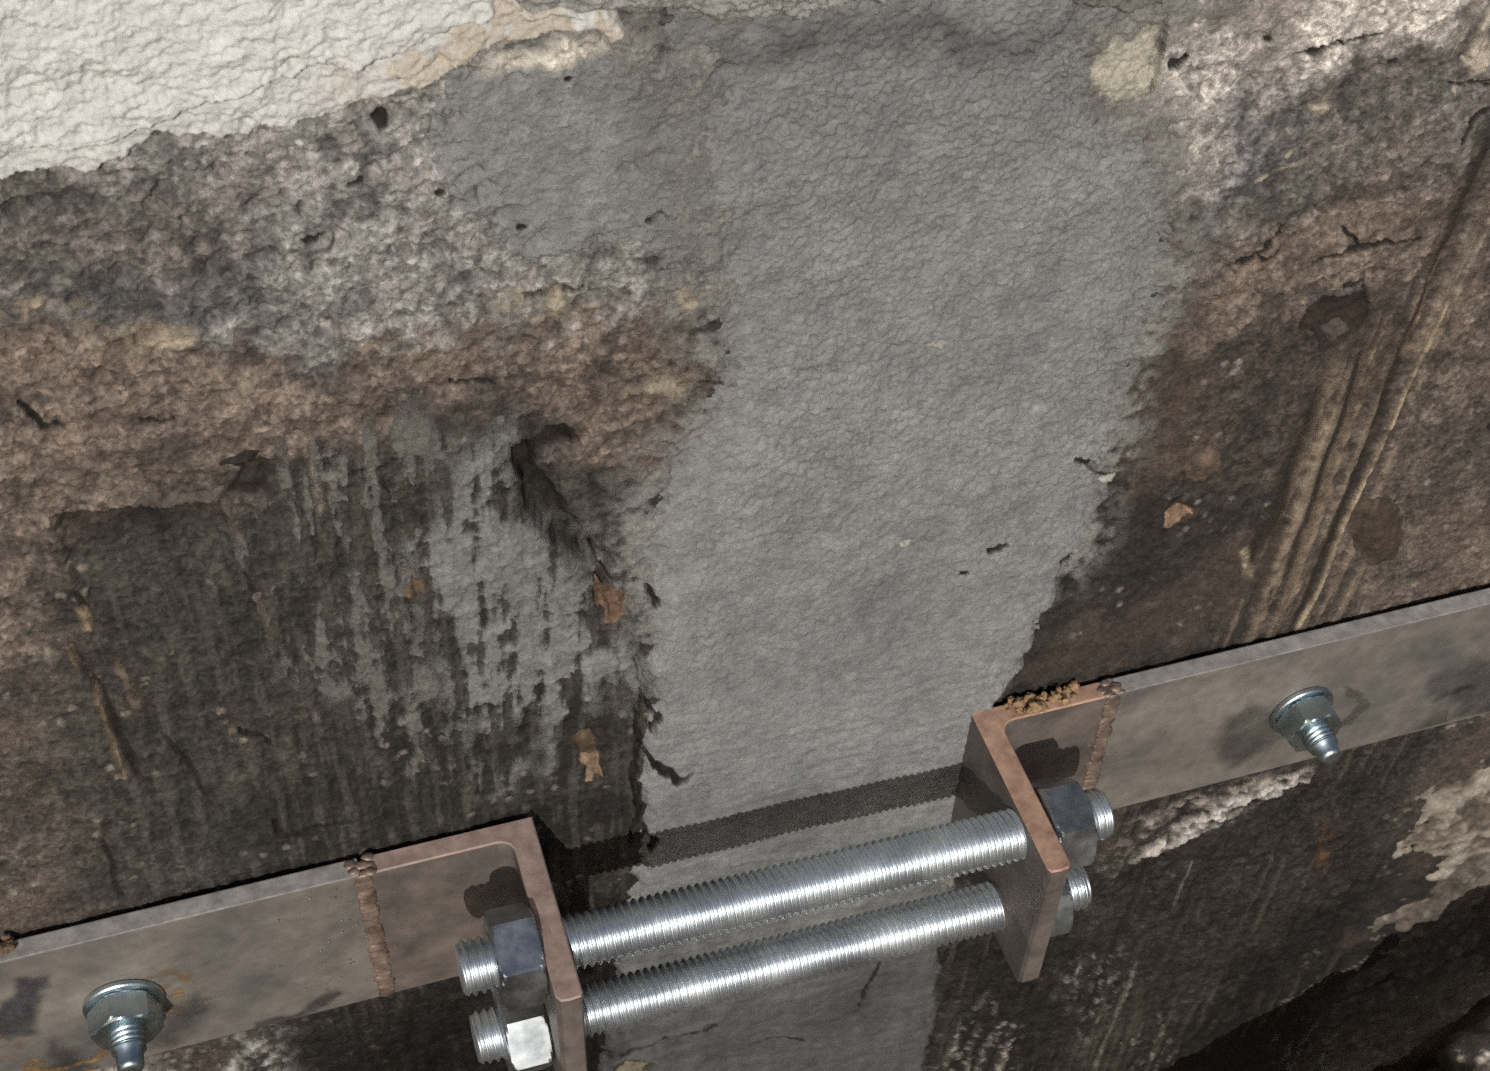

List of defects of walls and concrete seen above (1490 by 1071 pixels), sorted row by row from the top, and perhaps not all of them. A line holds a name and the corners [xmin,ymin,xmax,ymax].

peeling [0,0,495,152]
spalling [1168,53,1188,69]
crack [1226,224,1283,265]
crack [1317,225,1422,261]
peeling [547,285,567,313]
peeling [135,327,194,355]
peeling [623,375,685,398]
crack [511,423,615,590]
crack [646,583,659,607]
crack [628,684,690,851]
damp [1084,770,1310,937]
damp [951,1023,1016,1071]